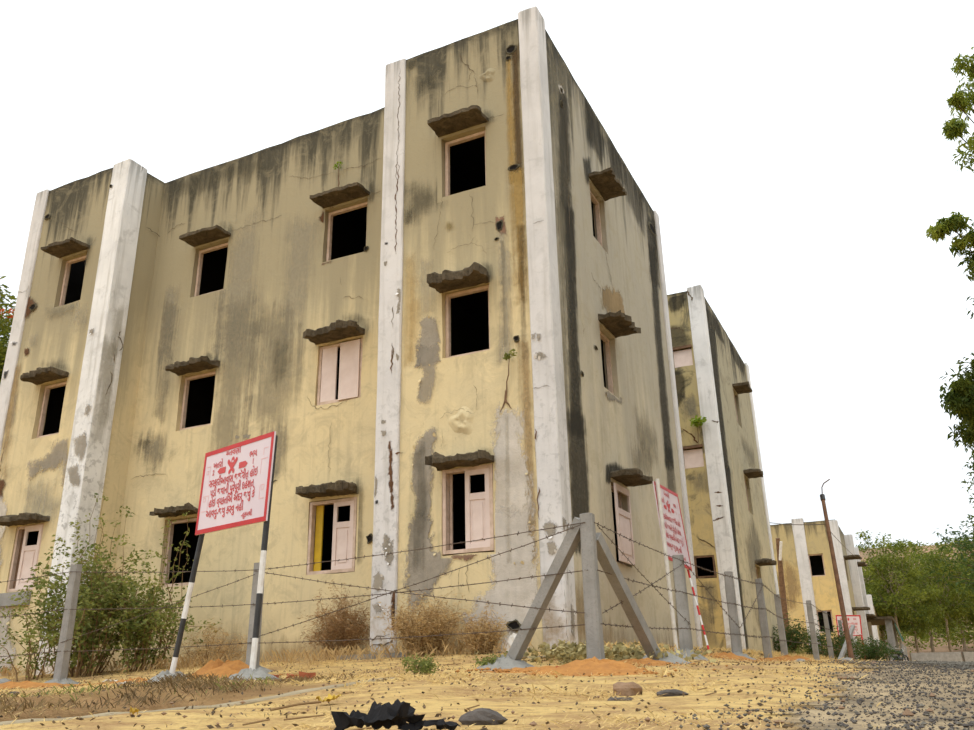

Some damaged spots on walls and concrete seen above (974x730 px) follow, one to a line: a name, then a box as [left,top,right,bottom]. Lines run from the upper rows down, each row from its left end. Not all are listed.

crack [292,73,400,251]
damp [583,105,623,183]
damp [552,66,589,519]
peeling [602,287,625,313]
peeling [415,315,441,403]
damp [640,219,695,492]
peeling [26,432,86,511]
damp [145,437,163,469]
damp [273,432,286,483]
damp [606,463,622,483]
peeling [366,406,569,652]